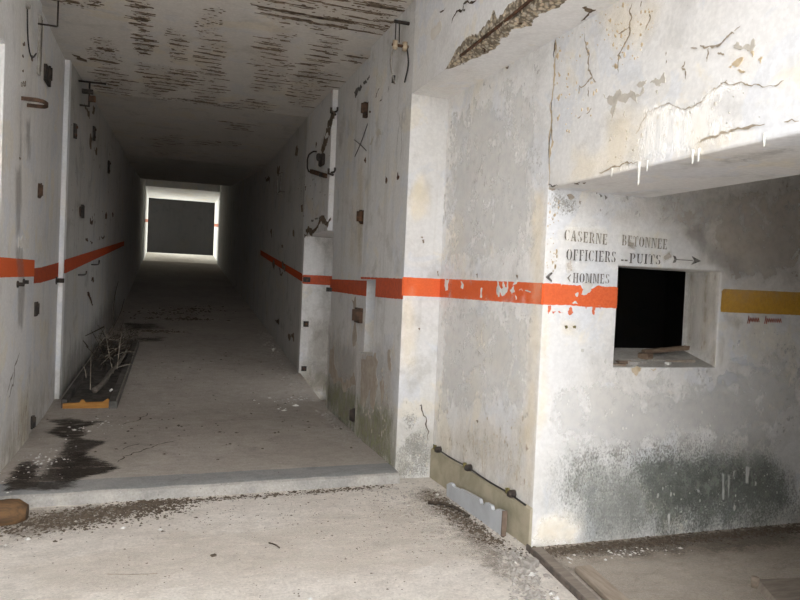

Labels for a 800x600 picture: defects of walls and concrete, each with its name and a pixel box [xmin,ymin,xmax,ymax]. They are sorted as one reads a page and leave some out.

spalling [446,0,566,69]
crack [548,40,558,187]
crack [578,35,596,119]
peeling [590,72,666,121]
crack [617,1,651,70]
crack [637,80,784,132]
crack [697,124,764,143]
peeling [729,38,763,73]
peeling [496,275,531,299]
peeling [548,280,601,315]
water stain [3,418,116,491]
water stain [567,427,784,535]